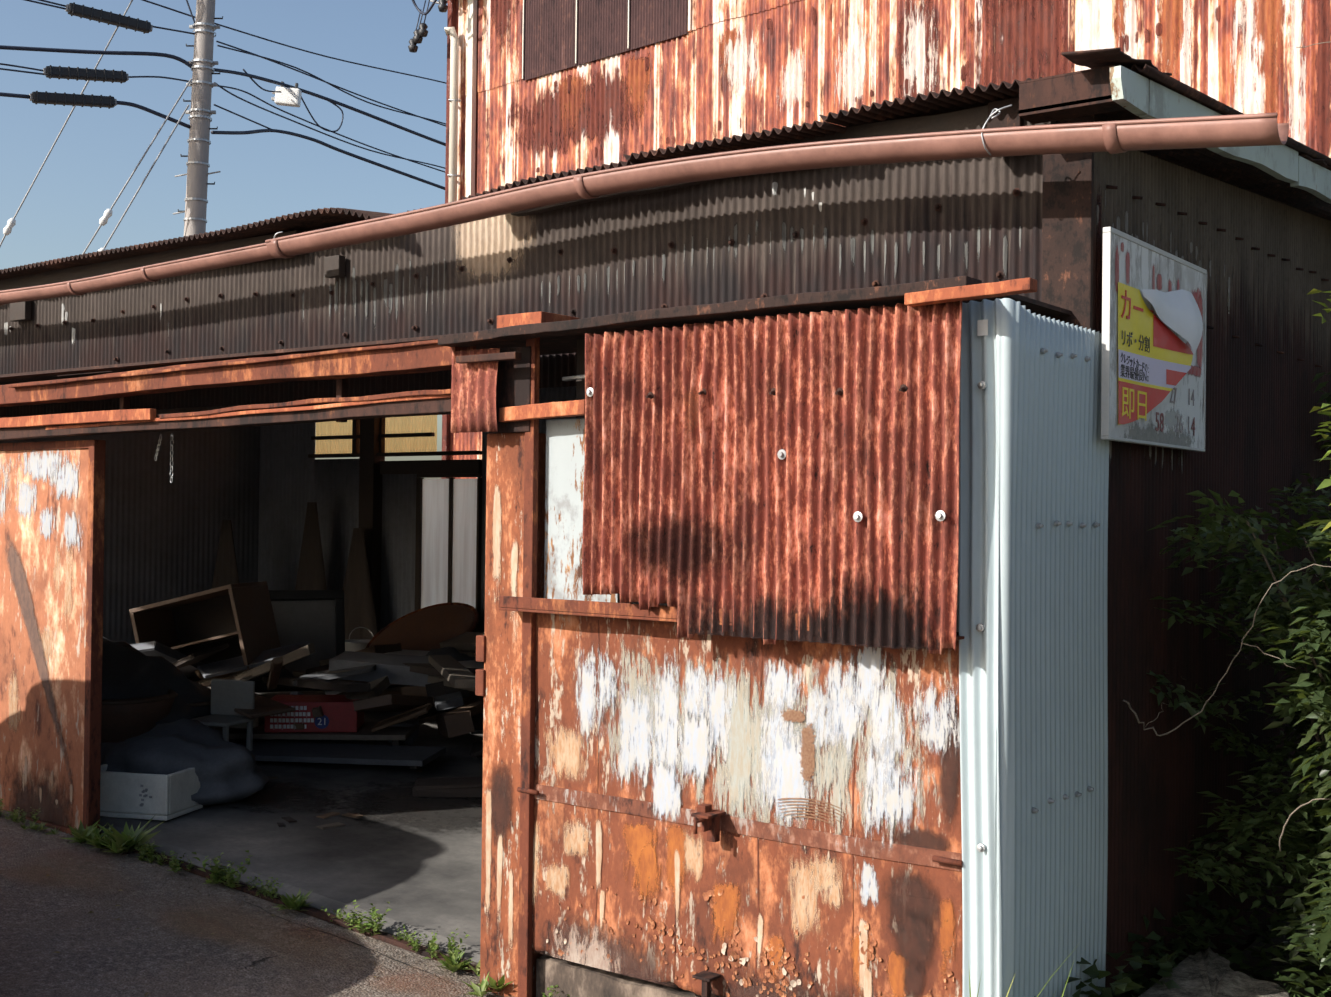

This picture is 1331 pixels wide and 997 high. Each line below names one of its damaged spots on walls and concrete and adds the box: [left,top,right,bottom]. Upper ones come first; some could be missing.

corrosion [719,29,742,85]
corrosion [897,0,945,100]
corrosion [961,0,1074,87]
corrosion [506,54,651,172]
peeling [0,449,83,661]
peeling [544,642,960,845]
corrosion [491,768,512,841]
peeling [532,819,589,901]
corrosion [546,824,819,997]
peeling [682,835,703,881]
peeling [788,858,843,938]
peeling [860,862,879,905]